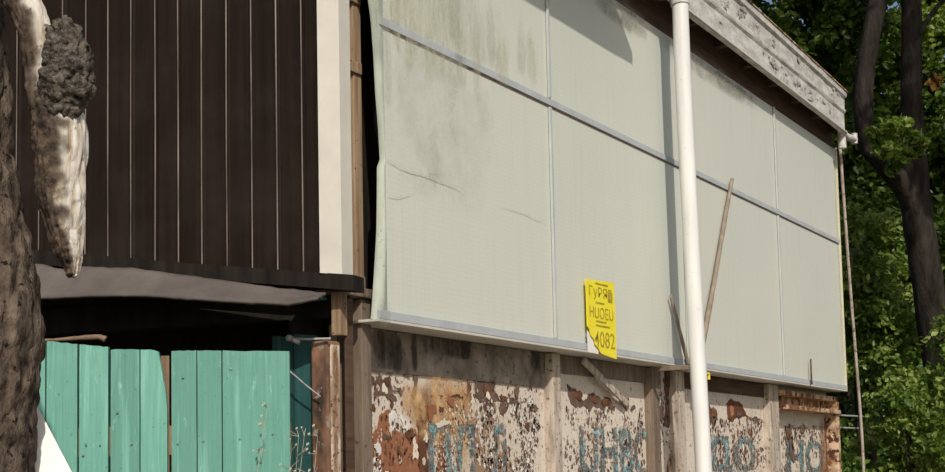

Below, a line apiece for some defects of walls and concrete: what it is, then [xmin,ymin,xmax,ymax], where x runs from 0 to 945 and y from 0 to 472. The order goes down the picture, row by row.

peeling [372,372,543,472]
peeling [564,384,645,472]
peeling [709,399,765,472]
peeling [781,424,825,472]